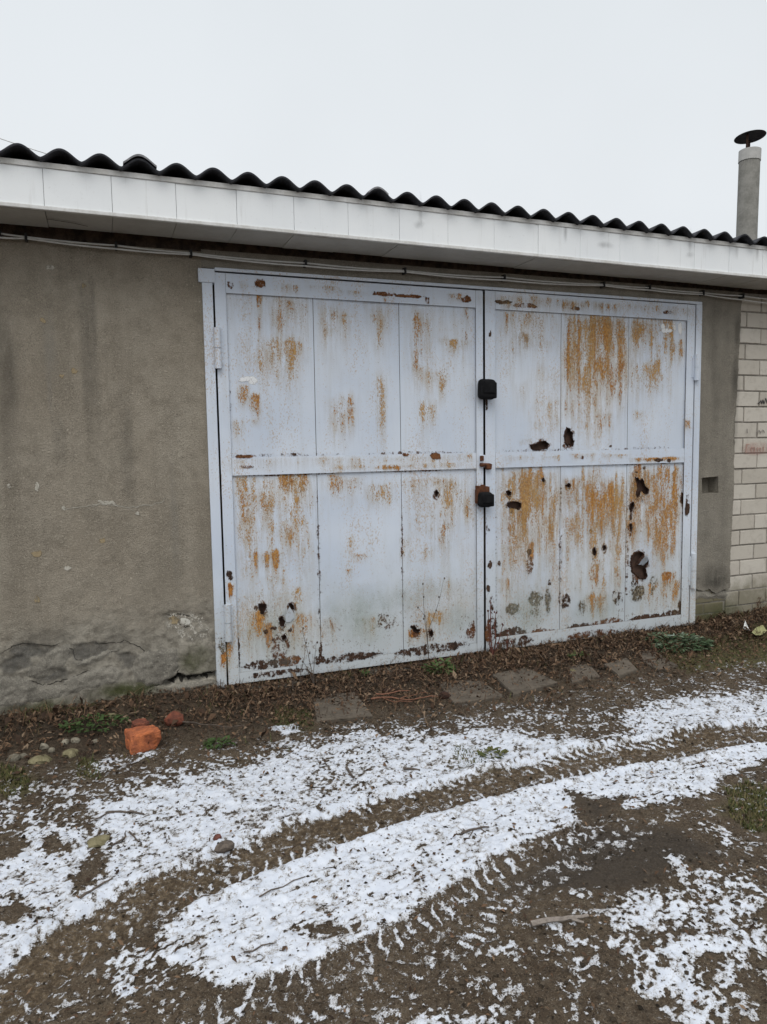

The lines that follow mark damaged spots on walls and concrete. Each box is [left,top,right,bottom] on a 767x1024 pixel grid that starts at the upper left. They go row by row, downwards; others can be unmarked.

rust [227,279,307,379]
rust [372,291,446,396]
rust [445,293,471,353]
rust [495,296,689,432]
rust [230,384,260,438]
rust [377,379,386,433]
rust [235,439,690,645]
spalling [164,611,211,641]
rust [218,638,233,667]
rust [242,587,336,666]